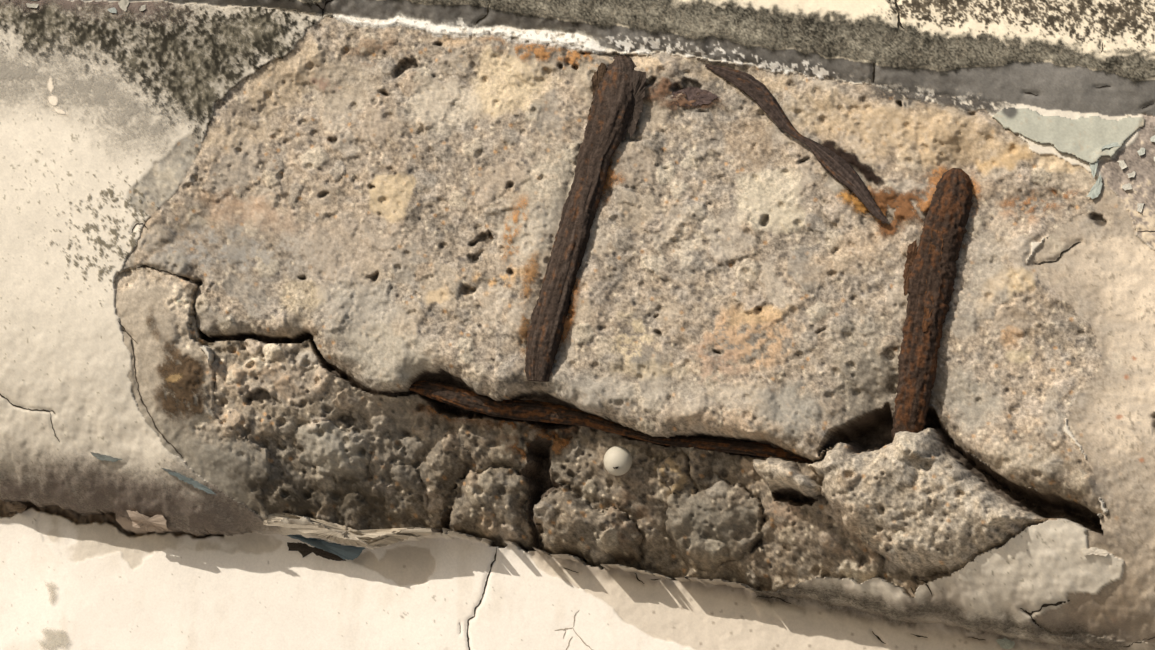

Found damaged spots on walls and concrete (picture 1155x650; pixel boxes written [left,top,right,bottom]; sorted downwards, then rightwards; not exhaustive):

damp [888,0,1155,49]
damp [0,0,851,153]
damp [866,78,934,96]
corrosion [523,254,538,298]
corrosion [560,278,578,343]
spalling [115,17,1145,598]
crack [0,394,60,442]
peeling [1027,178,1155,644]
crack [459,548,497,650]
crack [555,612,593,650]